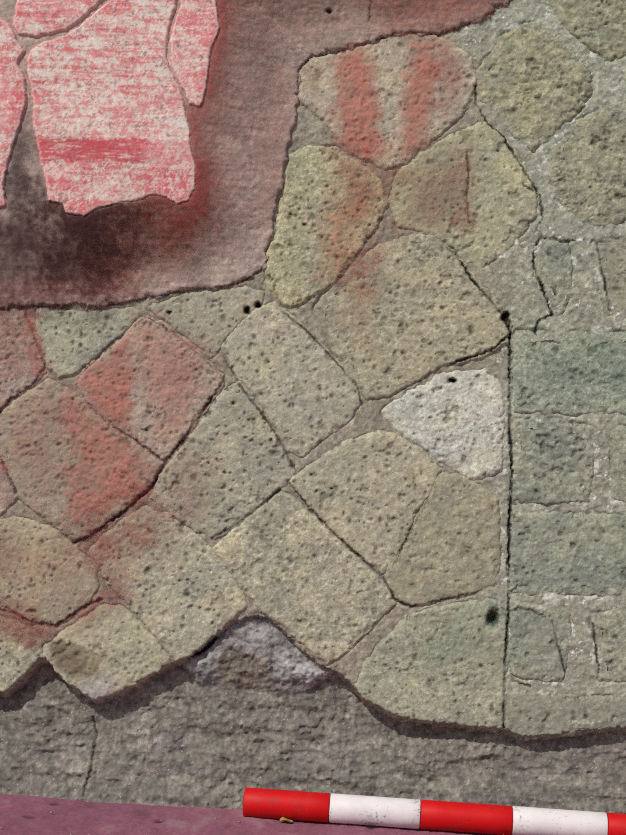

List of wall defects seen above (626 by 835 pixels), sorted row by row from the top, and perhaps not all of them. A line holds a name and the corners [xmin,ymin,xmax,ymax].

water stain [0,1,225,298]
peeling [0,0,509,311]
water stain [336,52,383,159]
crack [464,151,472,223]
crack [475,86,575,335]
crack [459,260,486,296]
crack [453,311,513,571]
spalling [182,617,338,694]
crack [503,598,534,687]
crack [592,623,600,673]
crack [84,716,97,791]